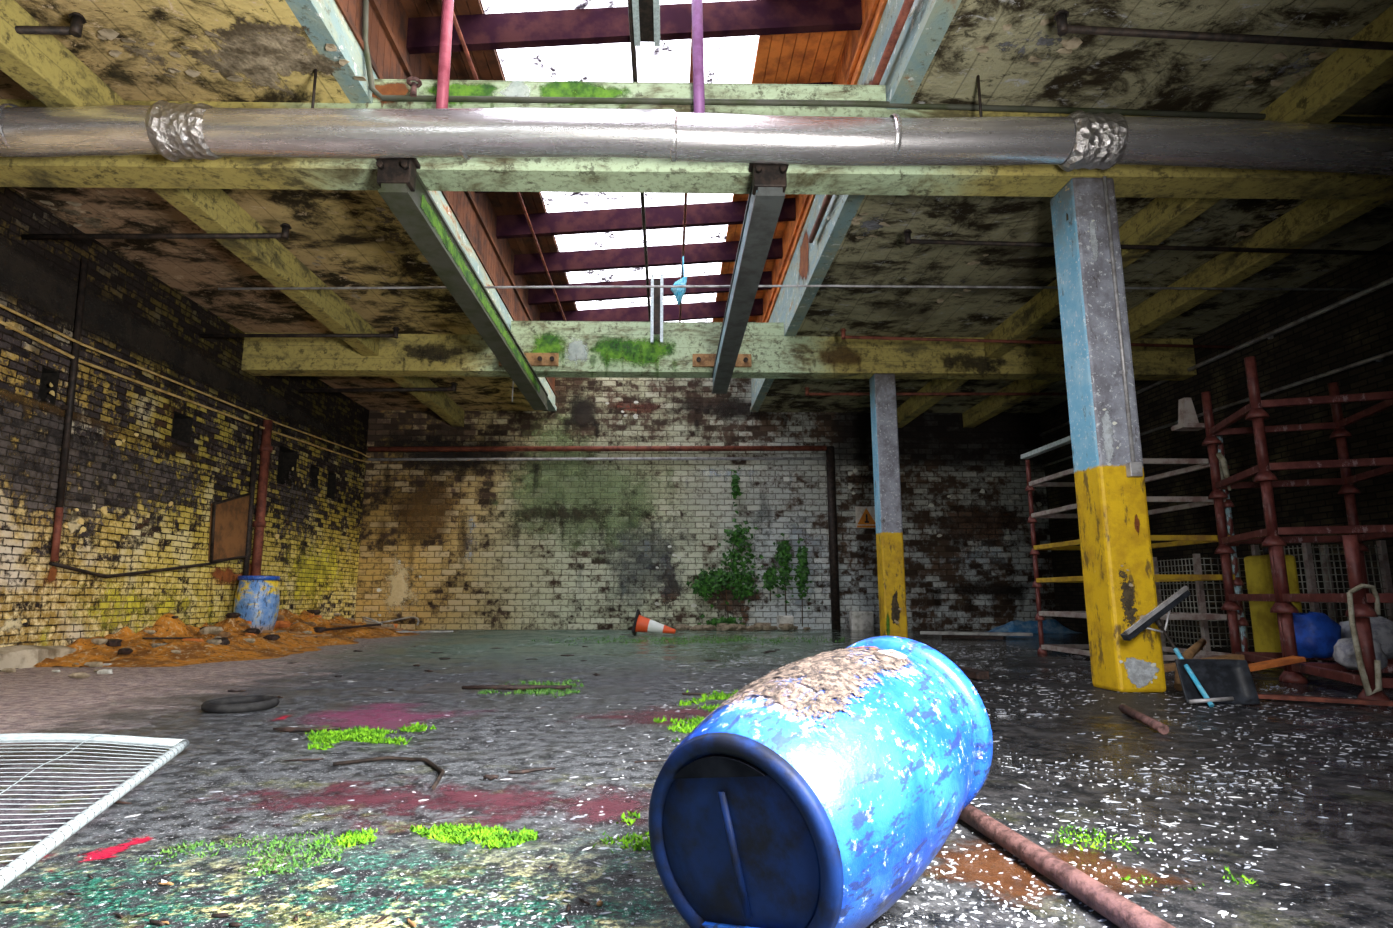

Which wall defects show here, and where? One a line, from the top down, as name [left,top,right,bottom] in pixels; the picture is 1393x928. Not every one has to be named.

water stain [107,67,134,85]
water stain [403,323,469,362]
water stain [941,353,1006,374]
rust [47,565,57,583]
rust [211,562,252,585]
water stain [377,555,422,616]
water stain [469,505,683,606]
water stain [788,519,820,608]
water stain [939,581,1028,600]
peeling [1119,658,1159,688]